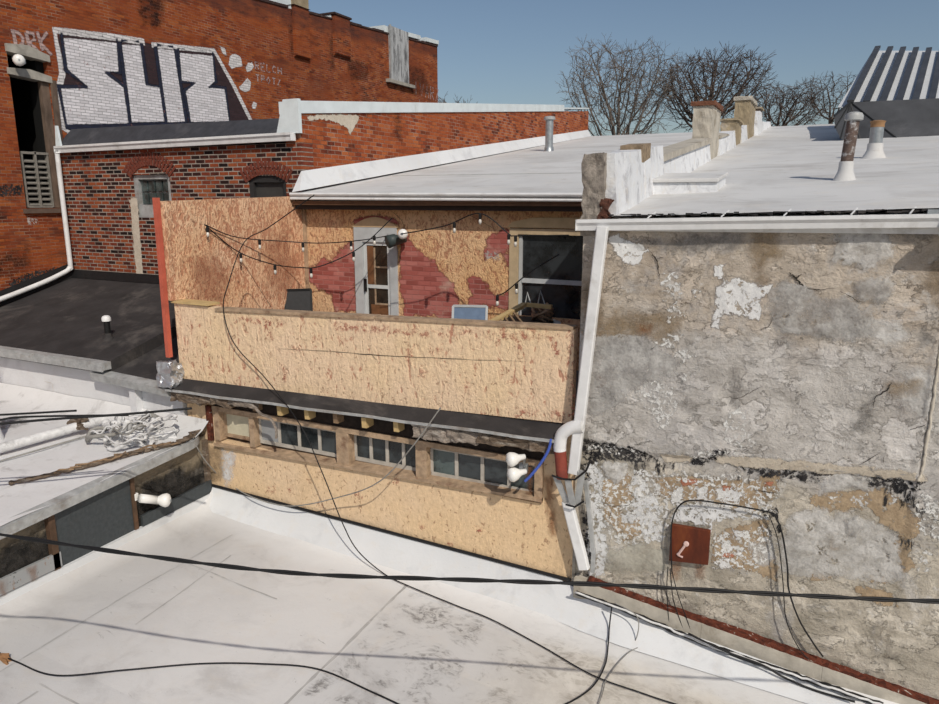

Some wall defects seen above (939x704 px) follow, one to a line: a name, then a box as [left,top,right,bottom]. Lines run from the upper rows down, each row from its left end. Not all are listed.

peeling [608,233,650,266]
flaking render [353,215,509,318]
flaking render [309,242,447,336]
peeling [711,264,773,329]
crack [789,272,857,301]
water stain [690,449,729,467]
peeling [584,405,939,582]
water stain [741,464,834,483]
water stain [865,476,926,494]
mould [0,533,49,578]
flaking render [855,576,899,609]